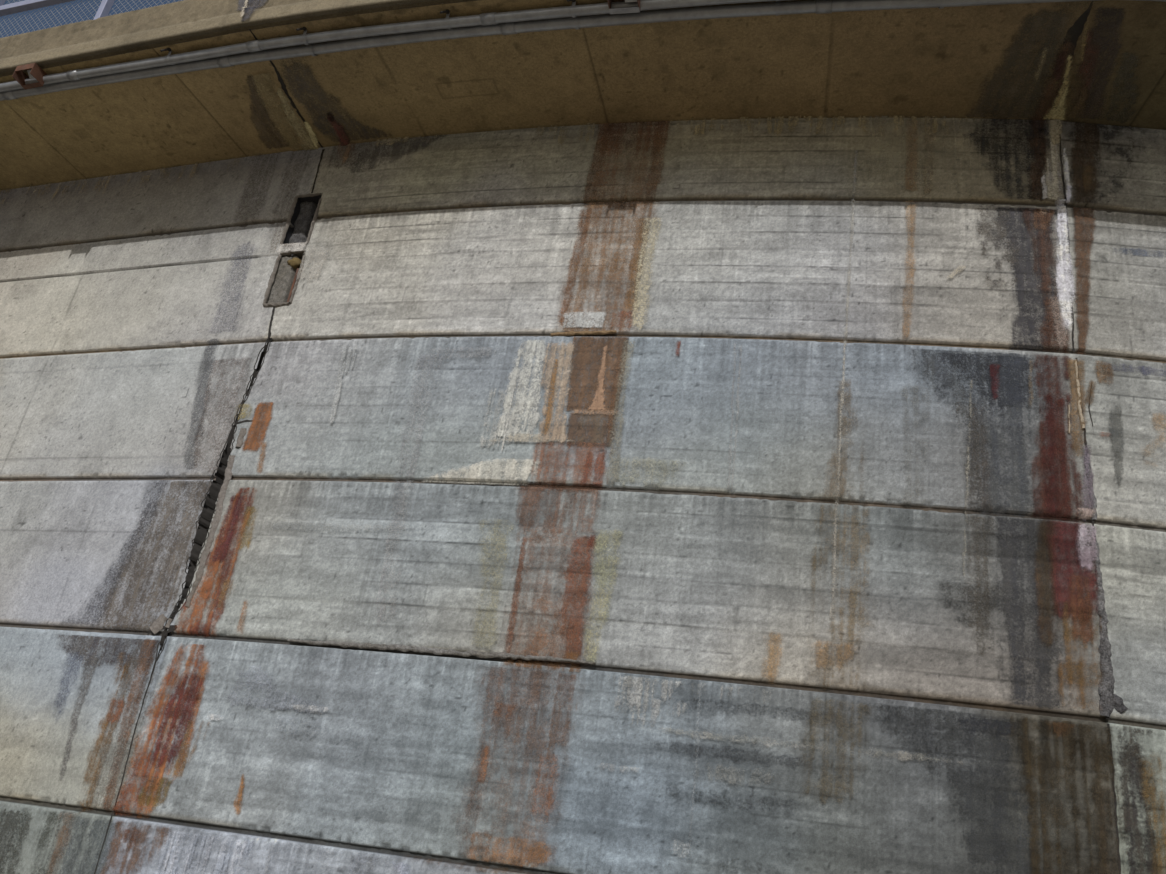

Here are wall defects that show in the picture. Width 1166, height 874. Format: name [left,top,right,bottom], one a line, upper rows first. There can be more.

water stain [32,242,253,874]
corrosion [81,487,255,874]
crack [94,307,275,874]
corrosion [238,402,273,472]
water stain [237,59,444,280]
corrosion [467,201,654,872]
water stain [740,1,1145,708]
corrosion [1011,717,1122,874]
corrosion [1023,31,1114,708]
crack [1057,121,1093,455]
crack [1063,1,1093,61]
water stain [1118,726,1160,874]